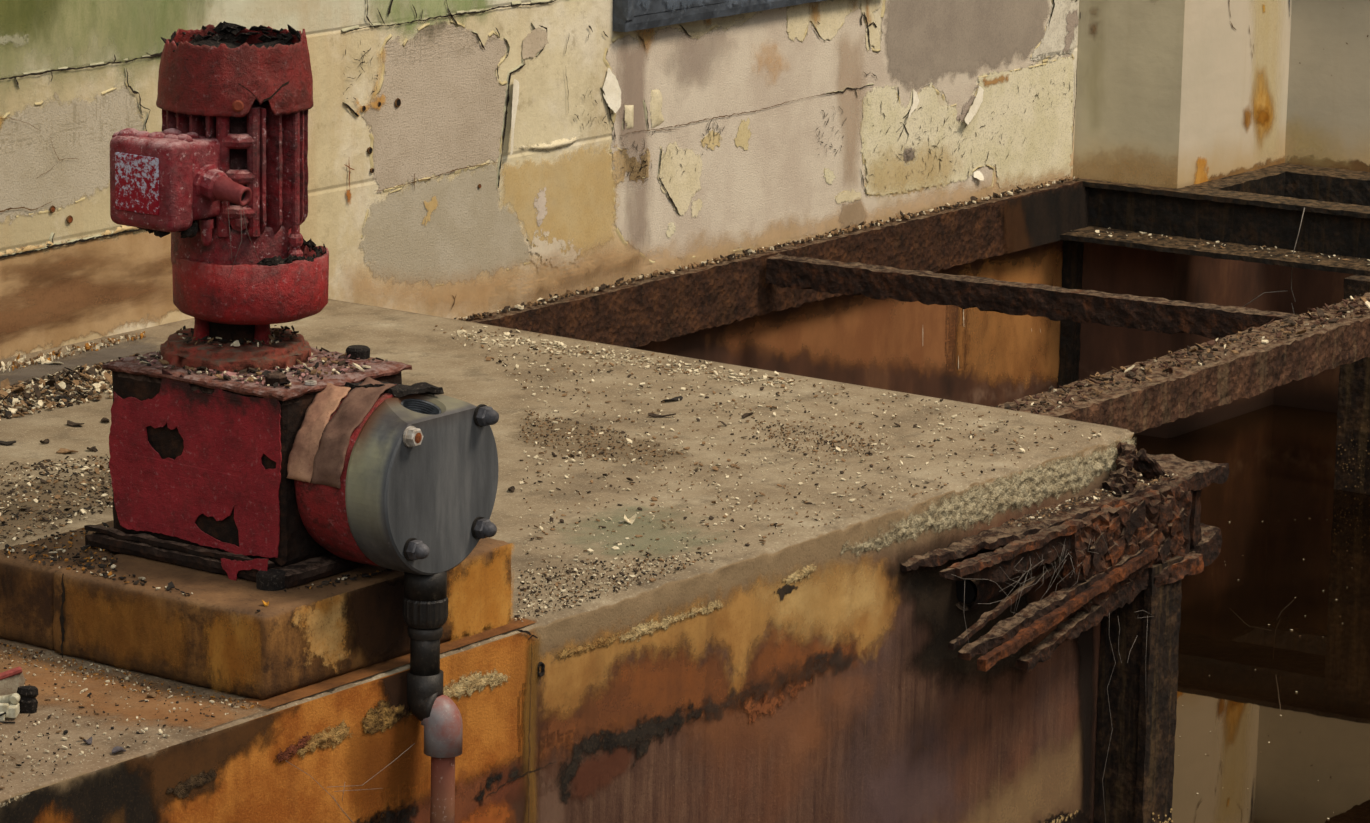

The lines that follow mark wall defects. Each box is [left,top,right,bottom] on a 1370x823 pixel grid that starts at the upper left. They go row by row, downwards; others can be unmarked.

peeling [0,83,146,224]
peeling [359,19,584,288]
crack [341,0,1079,215]
peeling [602,0,1079,265]
corrosion [1244,0,1277,149]
damp [0,232,179,385]
corrosion [723,297,1060,384]
corrosion [962,201,1063,287]
spalling [841,437,1135,555]
spalling [956,580,975,603]
corrosion [0,592,431,823]
corrosion [440,543,900,823]